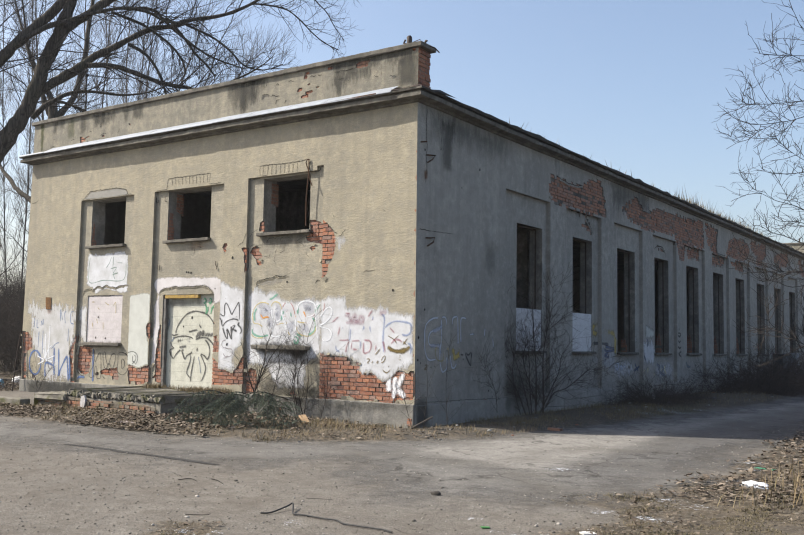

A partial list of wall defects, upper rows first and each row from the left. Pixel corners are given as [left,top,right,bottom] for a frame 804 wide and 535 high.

leakage [333,49,415,94]
spalling [305,159,336,280]
spalling [549,174,606,235]
spalling [622,196,749,273]
spalling [20,332,35,379]
spalling [70,322,161,385]
spalling [212,335,257,394]
spalling [319,352,421,404]